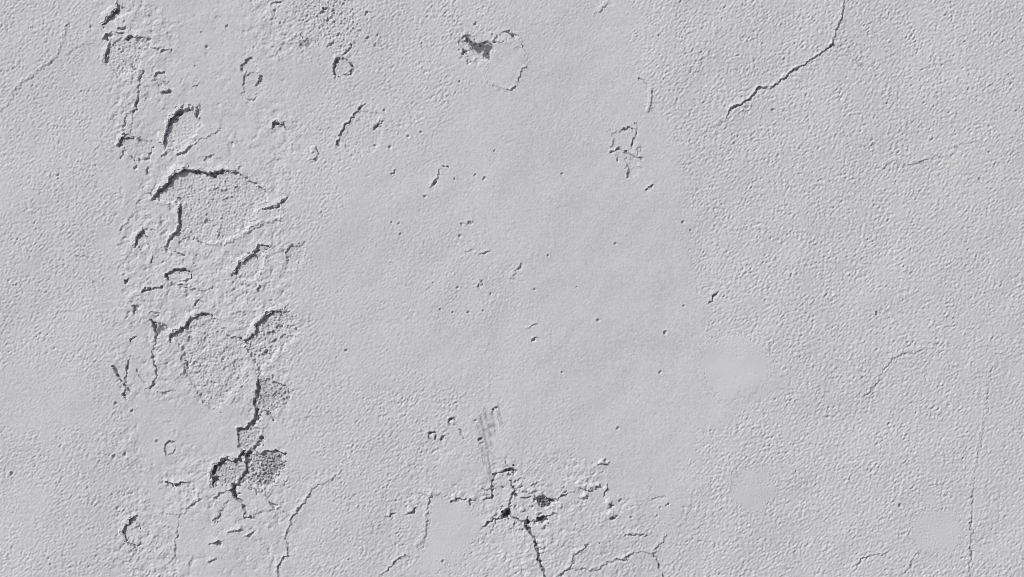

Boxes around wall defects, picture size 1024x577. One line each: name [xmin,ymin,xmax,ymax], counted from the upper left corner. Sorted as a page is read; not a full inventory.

spalling [457,30,529,93]
crack [701,0,865,135]
spalling [98,0,306,293]
spalling [111,285,301,564]
crack [480,456,667,577]